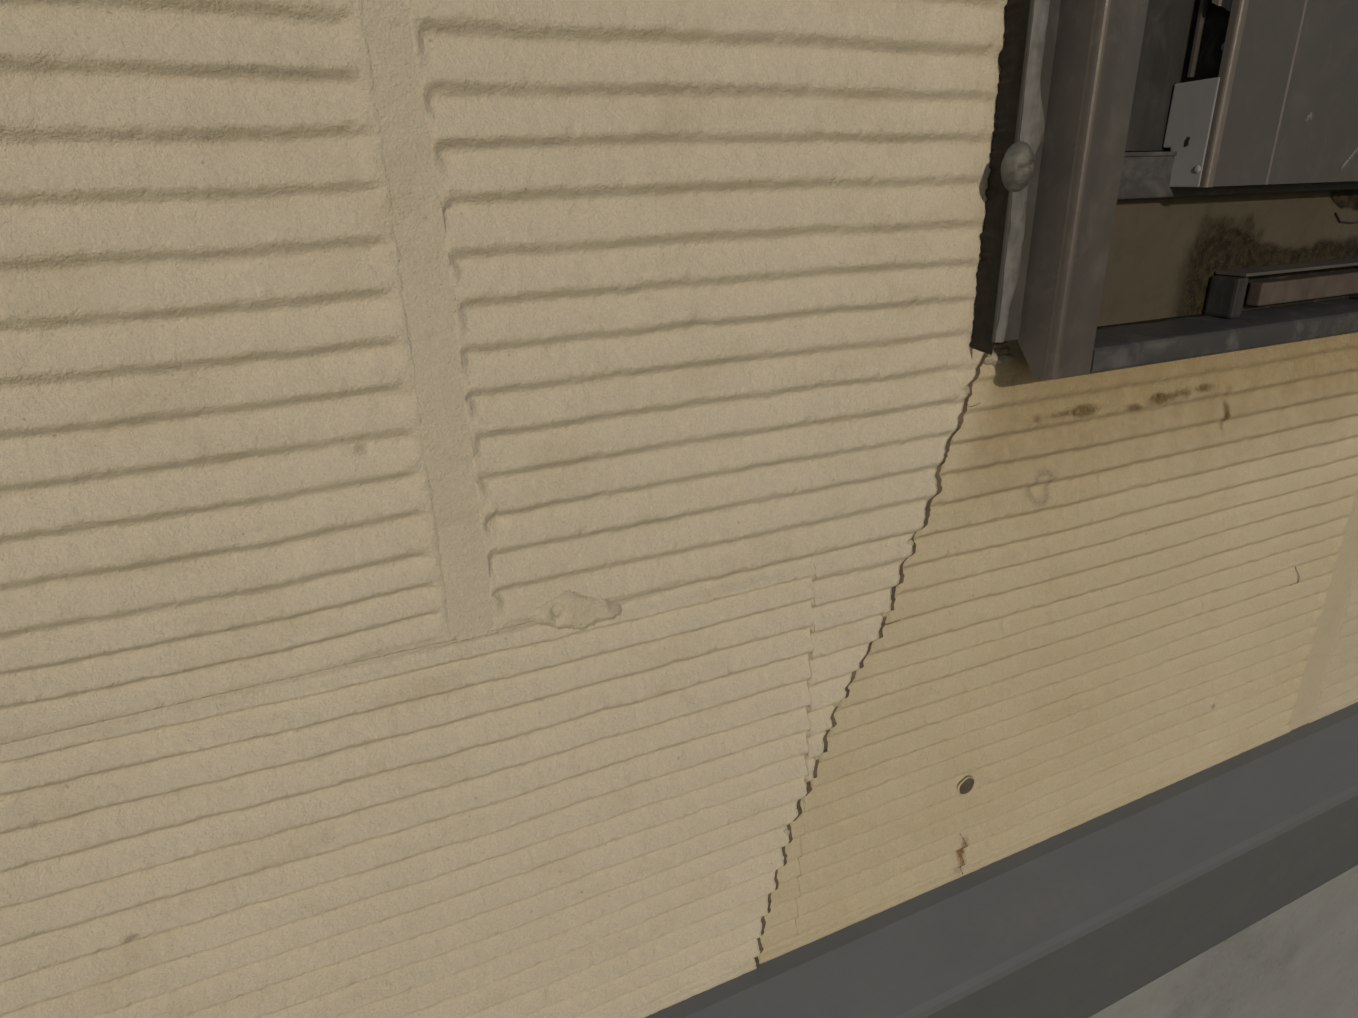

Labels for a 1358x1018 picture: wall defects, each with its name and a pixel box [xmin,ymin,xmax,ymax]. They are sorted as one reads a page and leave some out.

crack [754,343,995,967]
leakage [1014,332,1358,422]